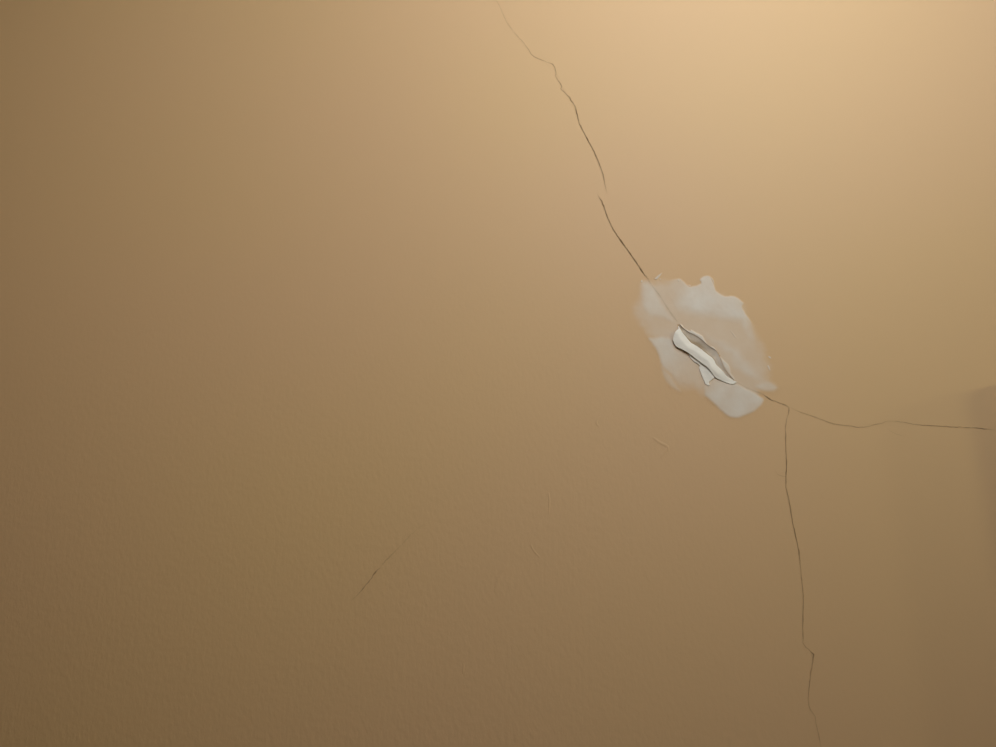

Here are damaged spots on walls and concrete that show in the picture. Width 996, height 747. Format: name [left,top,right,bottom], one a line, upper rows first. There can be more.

spalling [673,323,736,386]